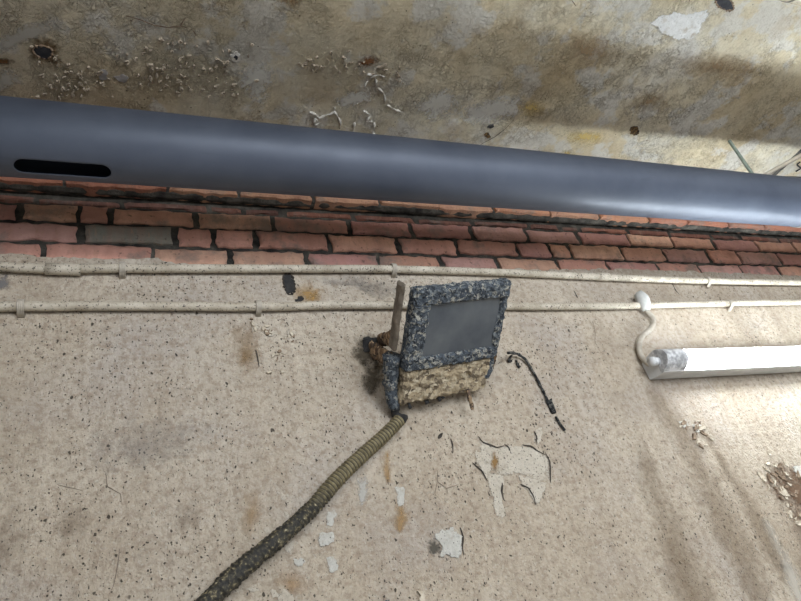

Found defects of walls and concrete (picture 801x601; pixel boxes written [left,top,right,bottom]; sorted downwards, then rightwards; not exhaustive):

peeling [650,10,709,41]
peeling [35,55,111,100]
peeling [115,37,259,98]
flaking render [678,419,714,449]
flaking render [472,427,551,520]
flaking render [757,449,801,526]
flaking render [318,510,337,547]
flaking render [435,527,463,558]